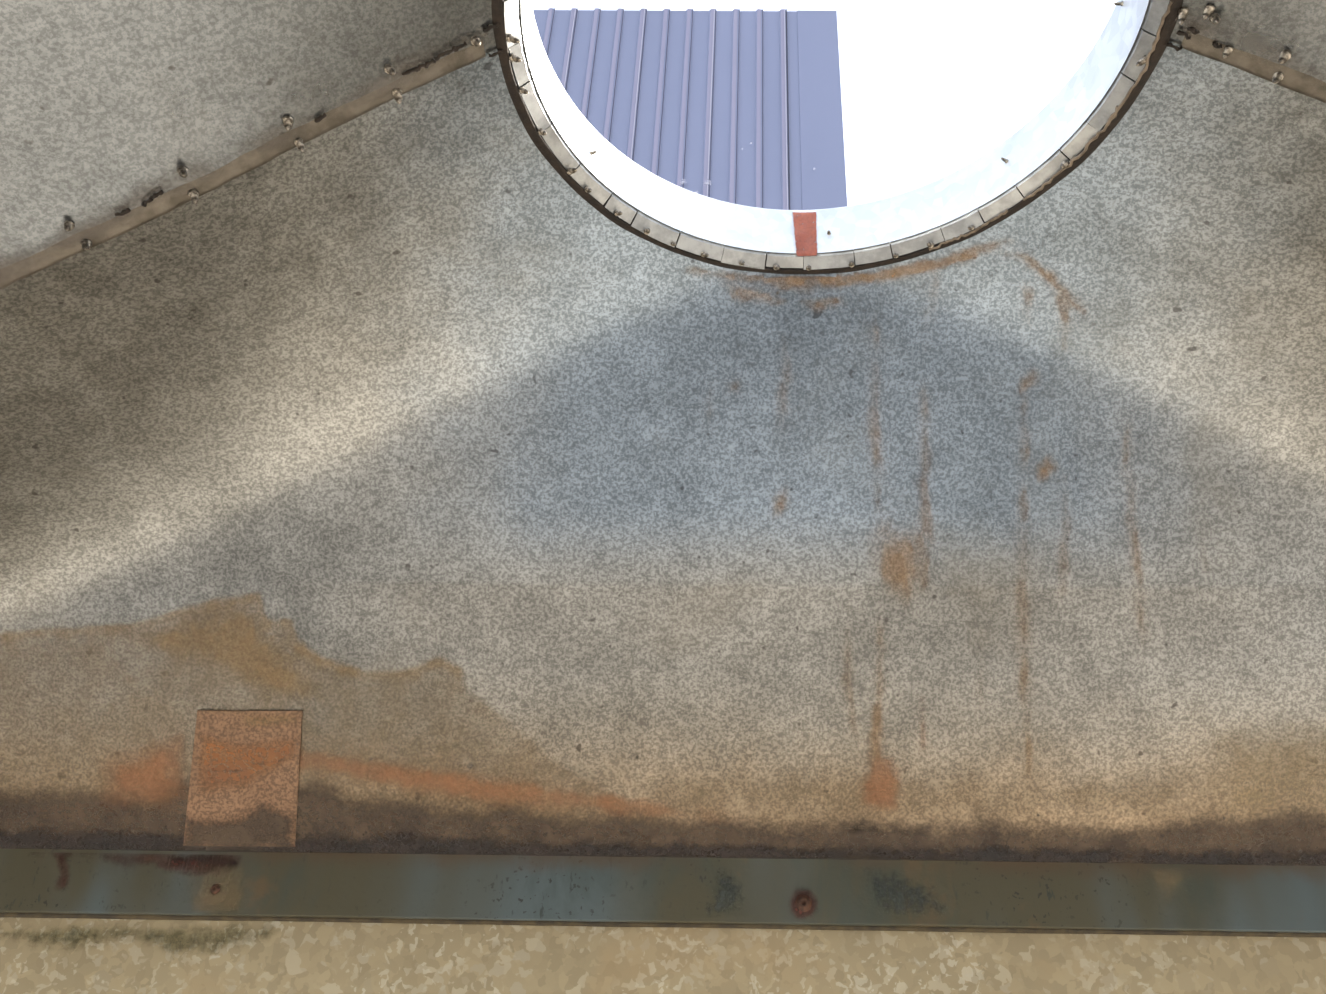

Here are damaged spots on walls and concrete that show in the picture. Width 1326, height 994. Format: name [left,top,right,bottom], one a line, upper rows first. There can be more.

rust [0,784,1326,888]